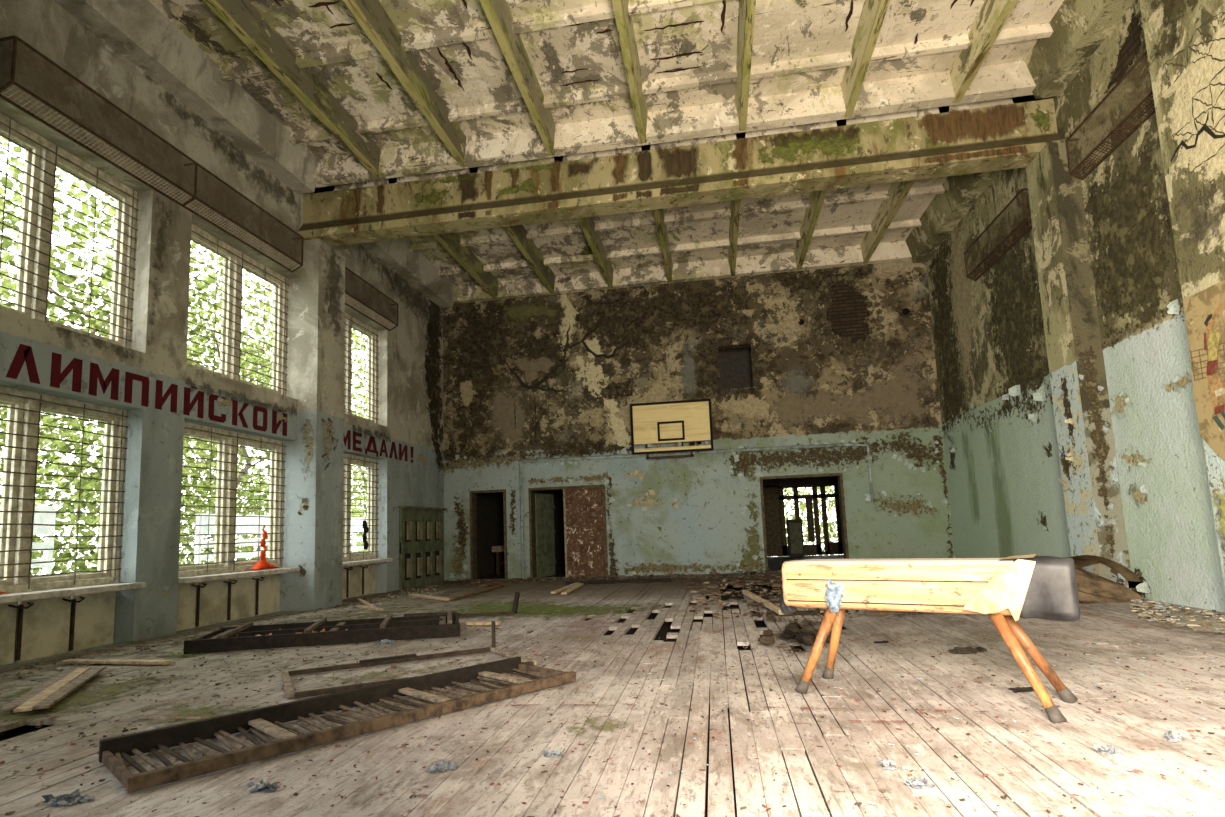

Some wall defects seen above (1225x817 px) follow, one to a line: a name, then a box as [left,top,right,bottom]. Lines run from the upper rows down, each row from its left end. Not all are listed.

leakage [1142,0,1200,66]
crack [1164,12,1225,173]
rust [769,126,860,148]
rust [457,171,492,219]
rust [548,158,598,209]
rust [613,146,699,202]
leakage [1083,138,1220,348]
leakage [359,245,632,472]
leakage [575,280,782,414]
peeling [444,221,1183,598]
peeling [1163,372,1191,393]
peeling [1214,477,1225,550]